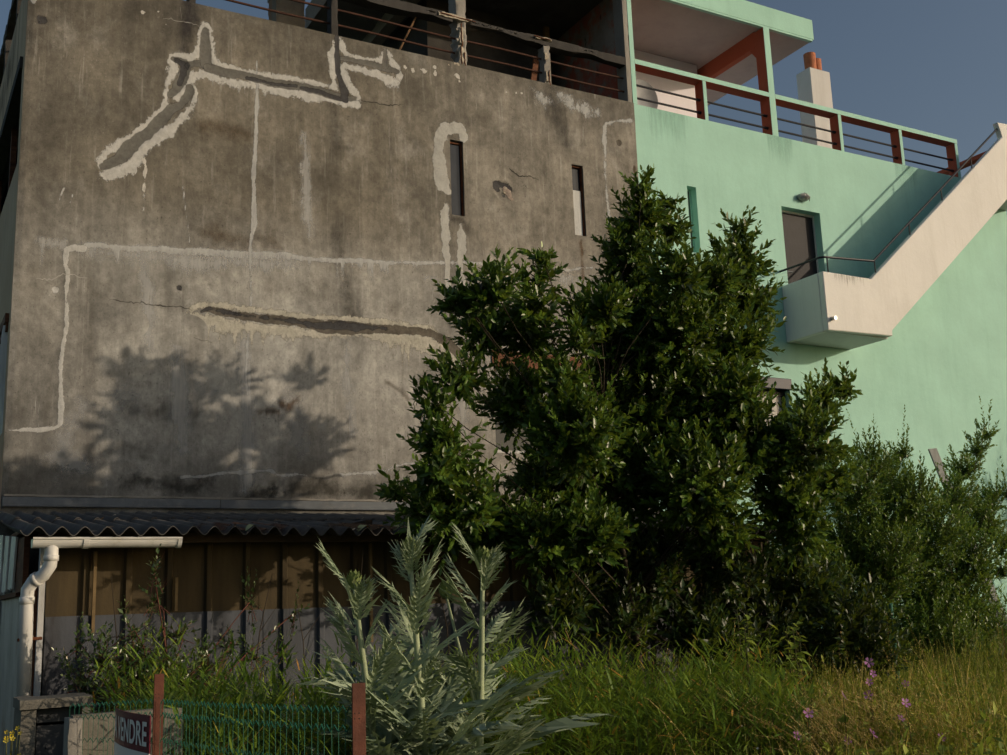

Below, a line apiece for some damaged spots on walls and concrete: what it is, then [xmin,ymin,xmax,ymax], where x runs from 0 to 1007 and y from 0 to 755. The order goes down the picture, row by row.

crack [95,18,403,182]
spalling [493,180,514,201]
crack [111,299,473,369]